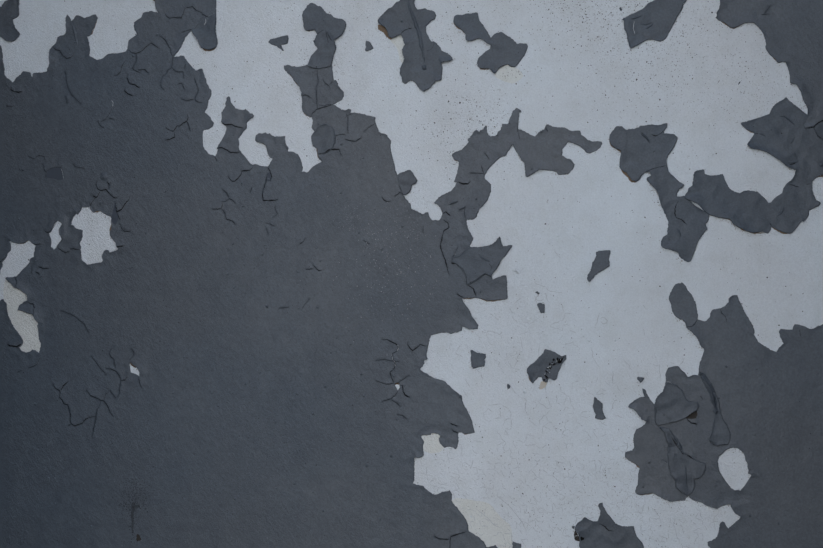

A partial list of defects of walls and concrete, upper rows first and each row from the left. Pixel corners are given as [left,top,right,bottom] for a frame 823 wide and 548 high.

peeling [0,0,157,82]
crack [114,5,208,140]
peeling [0,241,36,300]
peeling [49,207,118,264]
peeling [175,0,823,548]
crack [57,346,141,430]
crack [376,339,424,419]
crack [420,284,723,548]